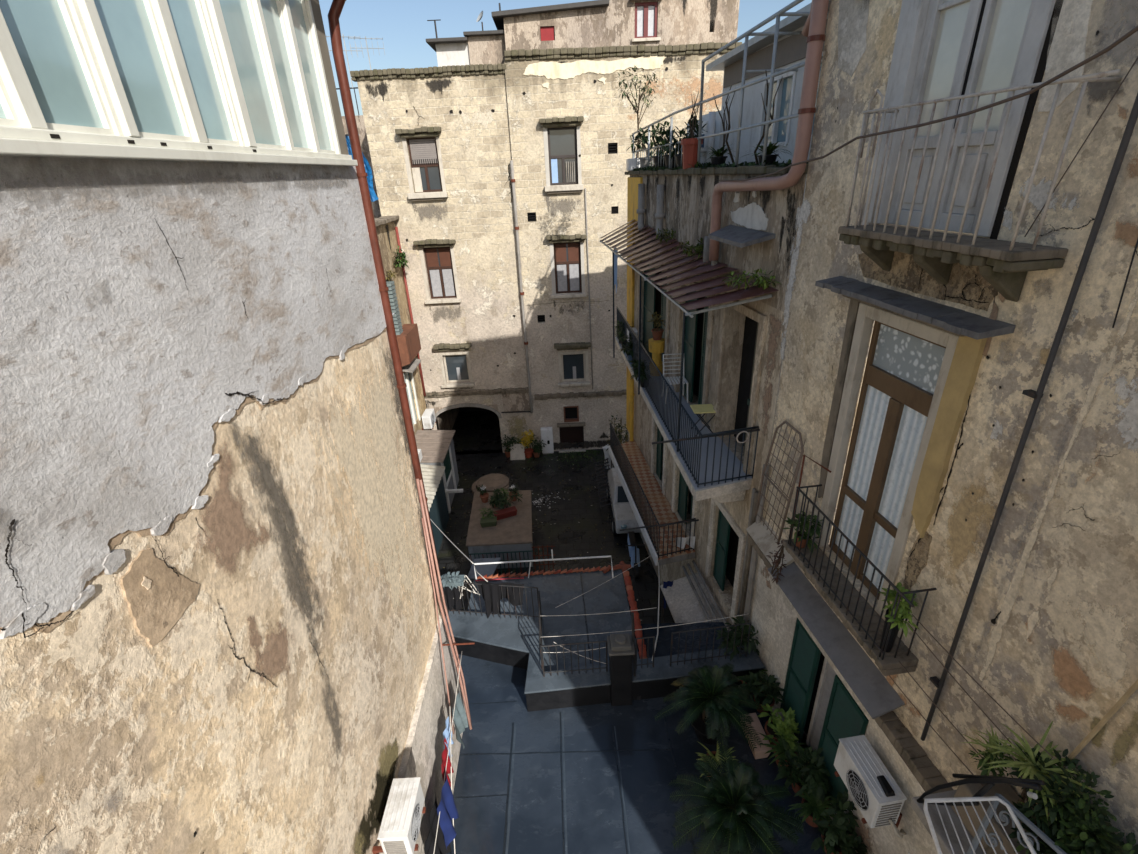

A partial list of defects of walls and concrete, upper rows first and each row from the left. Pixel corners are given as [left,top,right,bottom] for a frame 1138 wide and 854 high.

peeling [523,55,668,89]
crack [155,219,187,287]
peeling [731,191,769,230]
peeling [0,156,394,647]
peeling [1115,376,1138,452]
crack [0,519,75,638]
water stain [197,425,323,651]
crack [217,599,277,687]
water stain [247,617,290,680]
water stain [322,671,341,759]
mould [354,741,398,854]